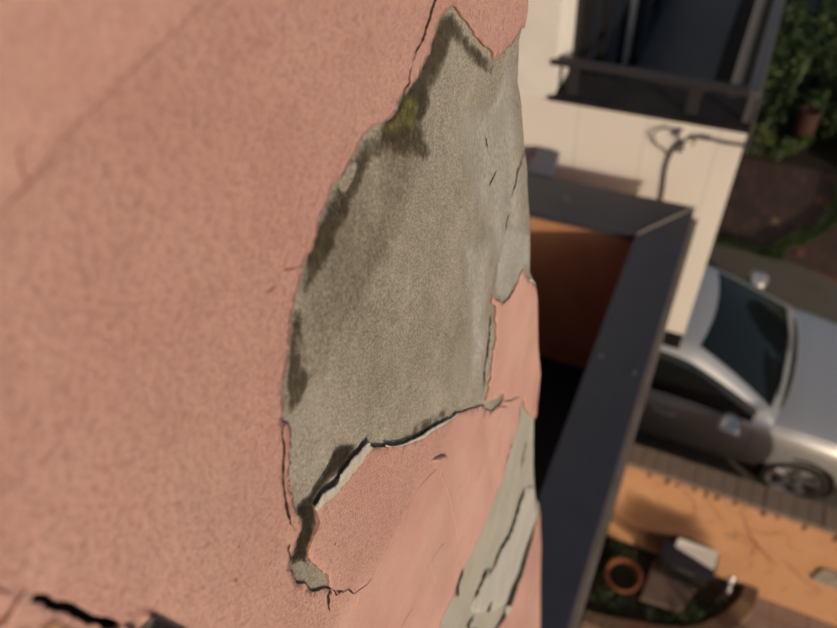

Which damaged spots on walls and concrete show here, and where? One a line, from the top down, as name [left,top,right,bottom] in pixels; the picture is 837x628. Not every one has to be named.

crack [400,0,436,102]
peeling [282,7,536,527]
spalling [31,593,118,628]
peeling [290,535,329,591]
peeling [440,402,539,628]